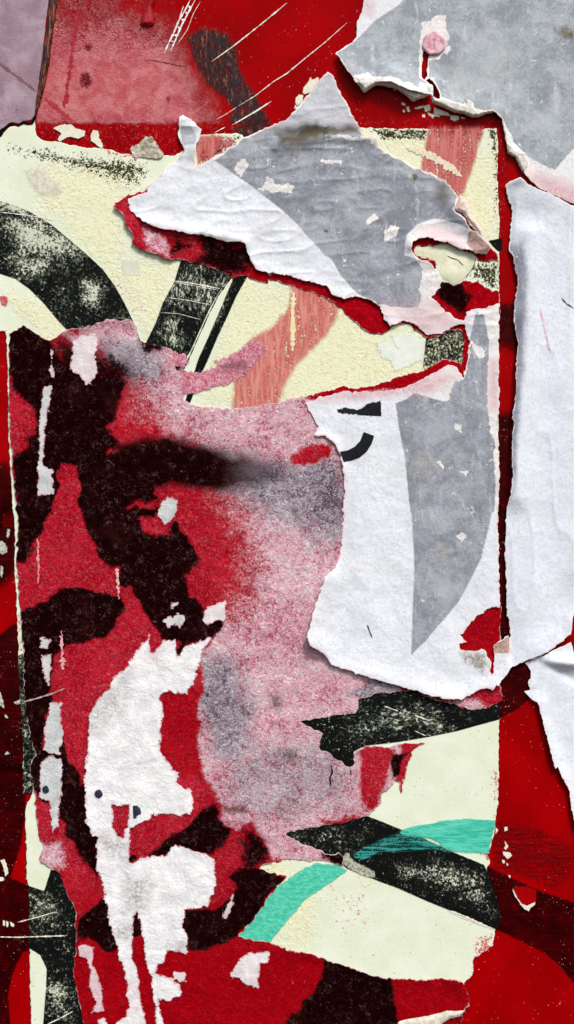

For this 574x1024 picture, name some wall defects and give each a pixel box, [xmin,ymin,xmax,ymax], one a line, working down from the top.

peeling [401,102,465,121]
peeling [130,136,164,159]